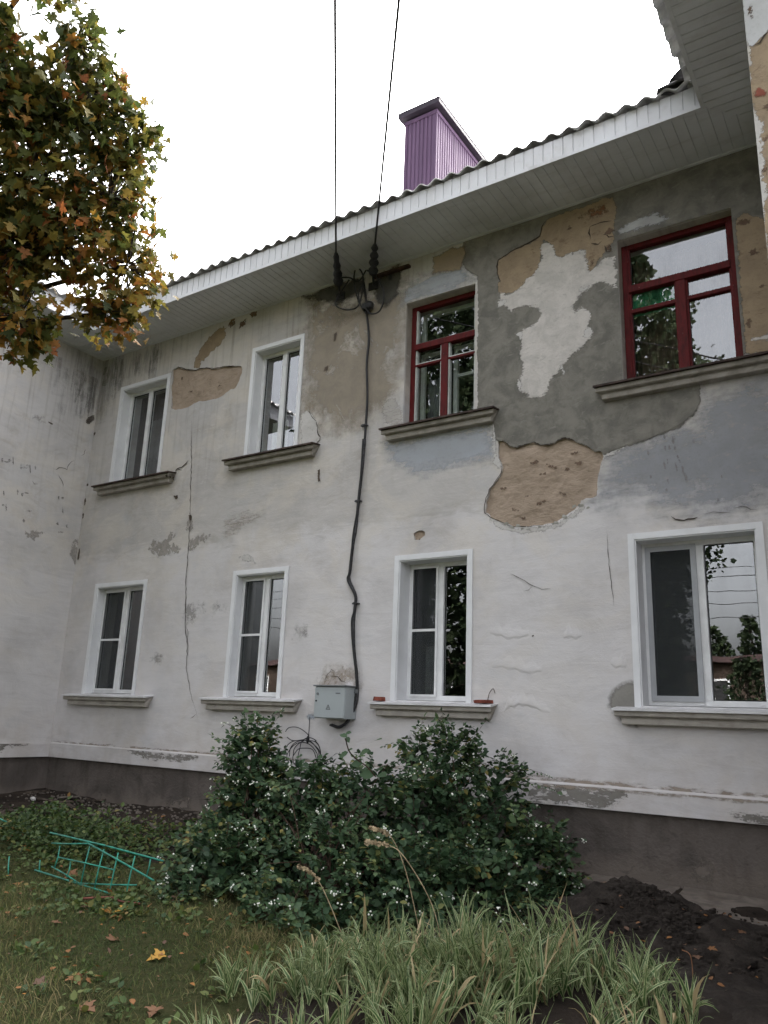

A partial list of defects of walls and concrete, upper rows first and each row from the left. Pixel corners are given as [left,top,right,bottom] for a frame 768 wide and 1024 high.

peeling [735,31,768,354]
peeling [432,246,466,274]
peeling [496,197,617,294]
spalling [172,312,257,410]
spalling [484,424,624,534]
crack [173,421,197,717]
peeling [129,750,198,762]
peeling [528,785,628,808]
peeling [734,812,768,825]